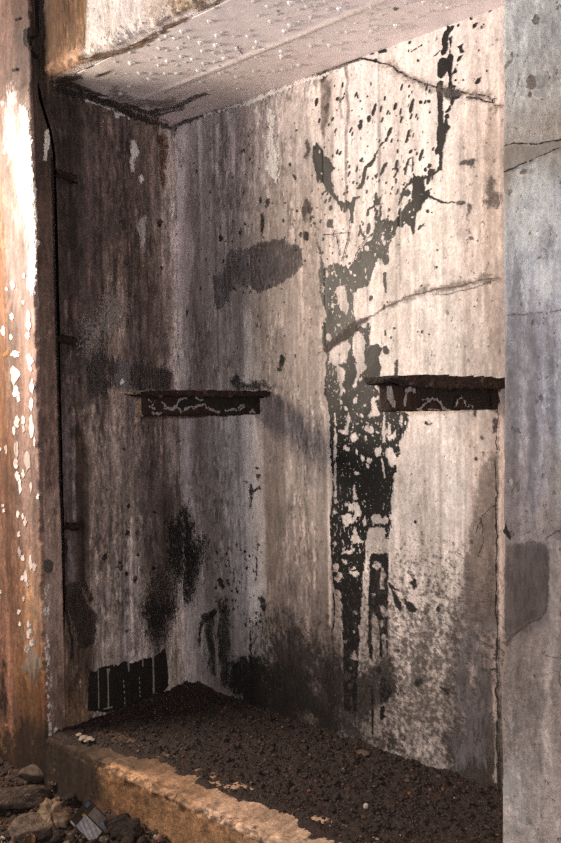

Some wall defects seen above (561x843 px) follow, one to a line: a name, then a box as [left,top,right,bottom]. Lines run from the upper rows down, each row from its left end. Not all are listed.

corrosion [42,0,87,91]
water stain [76,17,188,64]
crack [360,57,502,111]
water stain [424,25,460,178]
crack [501,139,561,172]
peeling [22,300,32,340]
crack [318,273,500,353]
peeling [0,351,39,500]
peeling [17,597,33,653]
peeling [18,547,37,588]
water stain [139,504,265,689]
crack [476,409,502,788]